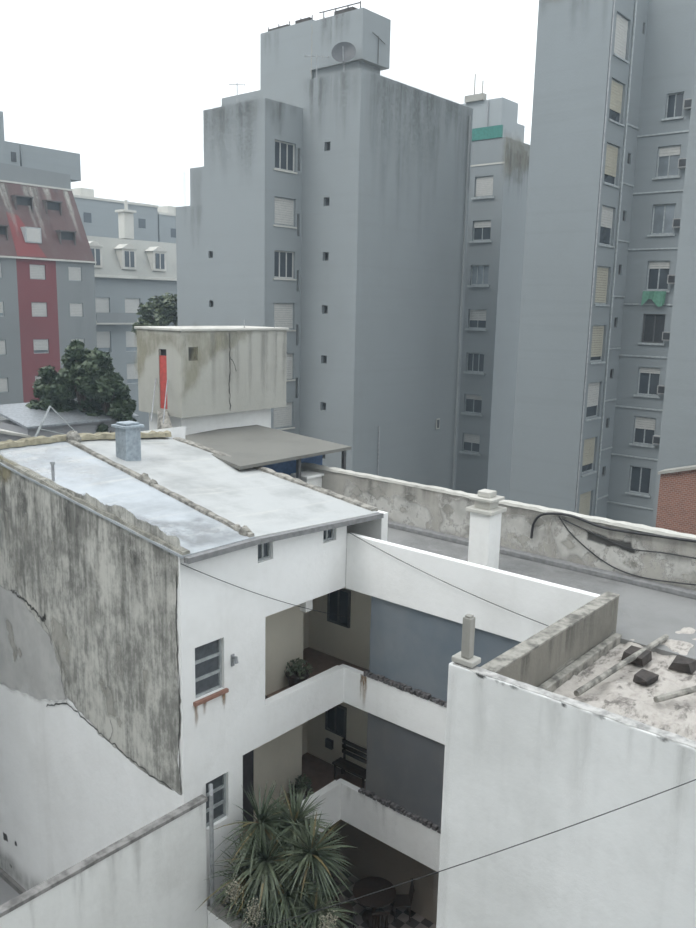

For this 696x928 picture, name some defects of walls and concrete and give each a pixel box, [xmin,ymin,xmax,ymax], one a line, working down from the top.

crack [228,333,236,409]
peeling [344,484,475,537]
peeling [500,514,696,583]
damp [0,465,182,795]
crack [11,579,181,792]